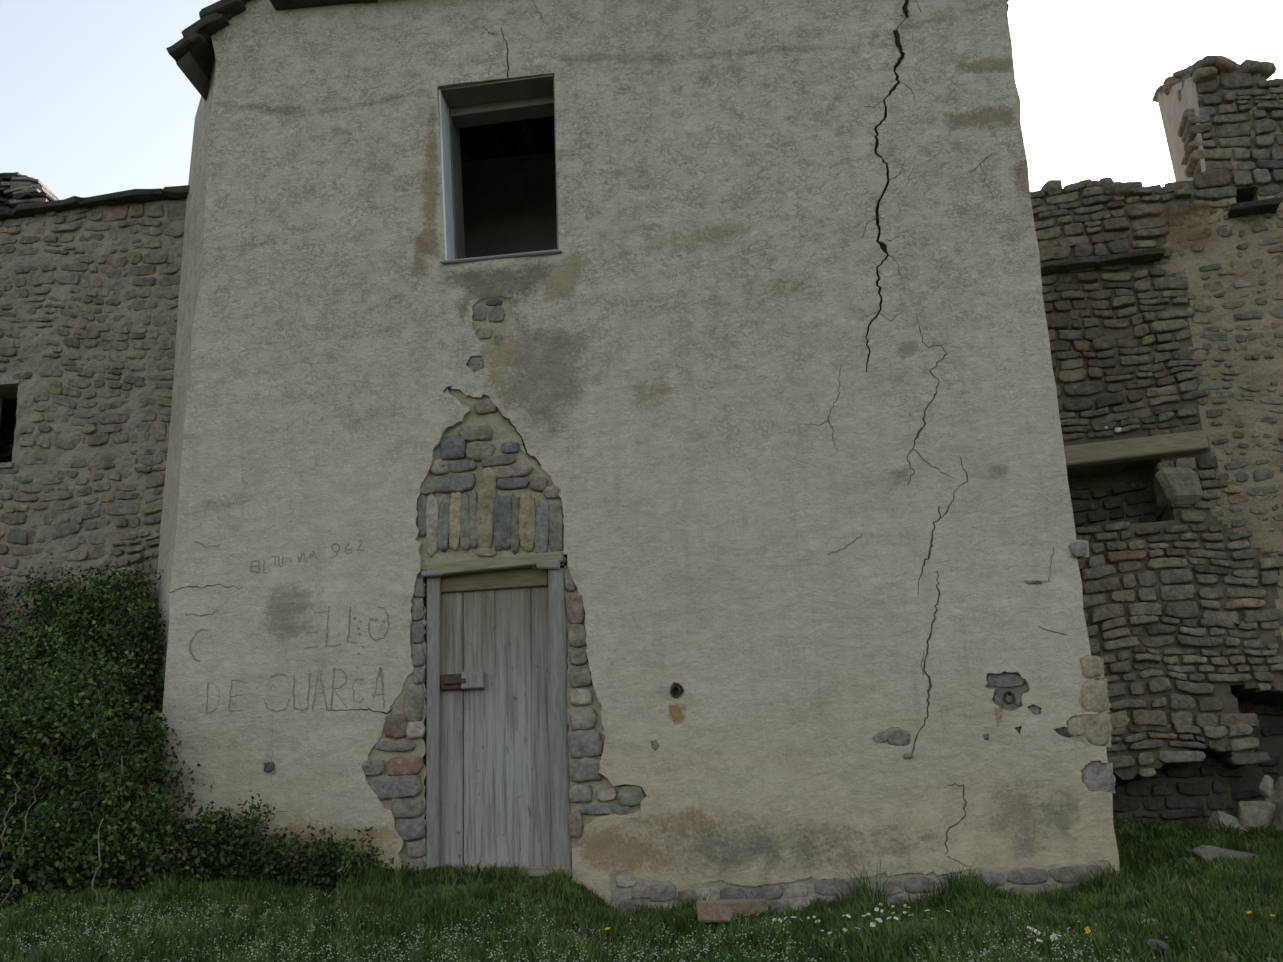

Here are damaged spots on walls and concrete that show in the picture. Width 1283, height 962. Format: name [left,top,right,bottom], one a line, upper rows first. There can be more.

crack [970,154,1019,223]
spalling [467,296,512,372]
crack [805,0,968,753]
spalling [362,388,647,872]
spalling [985,672,1041,714]
spalling [1053,655,1116,793]